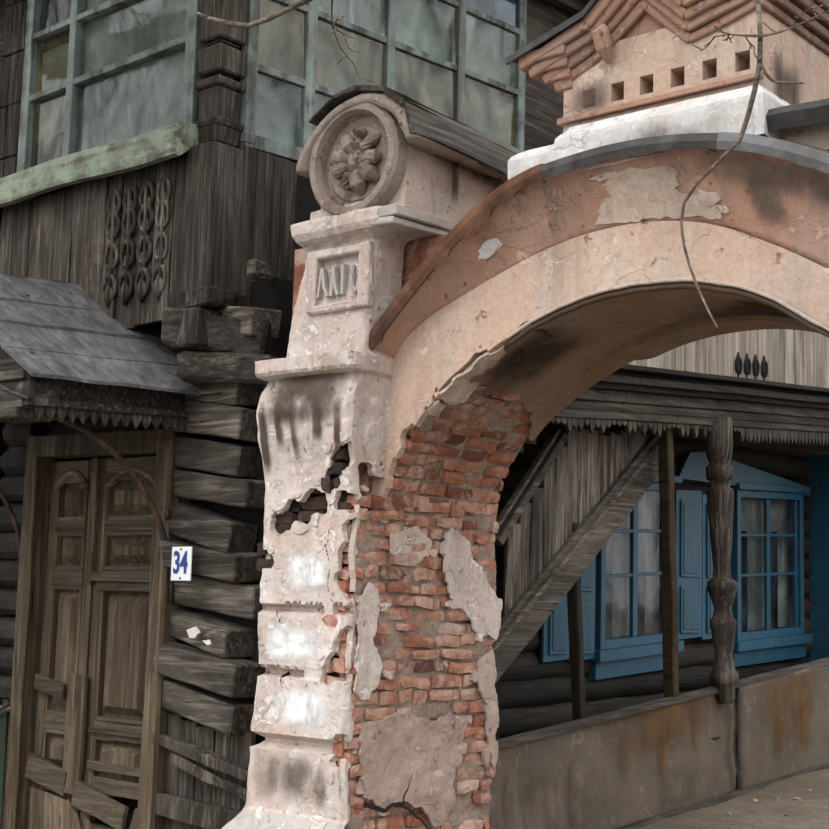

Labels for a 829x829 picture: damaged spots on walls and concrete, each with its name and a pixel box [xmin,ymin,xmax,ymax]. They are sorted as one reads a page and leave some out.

flaking render [587,165,730,225]
flaking render [269,432,354,534]
flaking render [256,542,275,571]
flaking render [265,520,394,700]
flaking render [389,526,503,772]
peeling [267,689,325,727]
flaking render [324,734,347,785]
flaking render [355,712,467,827]
crack [363,772,431,829]